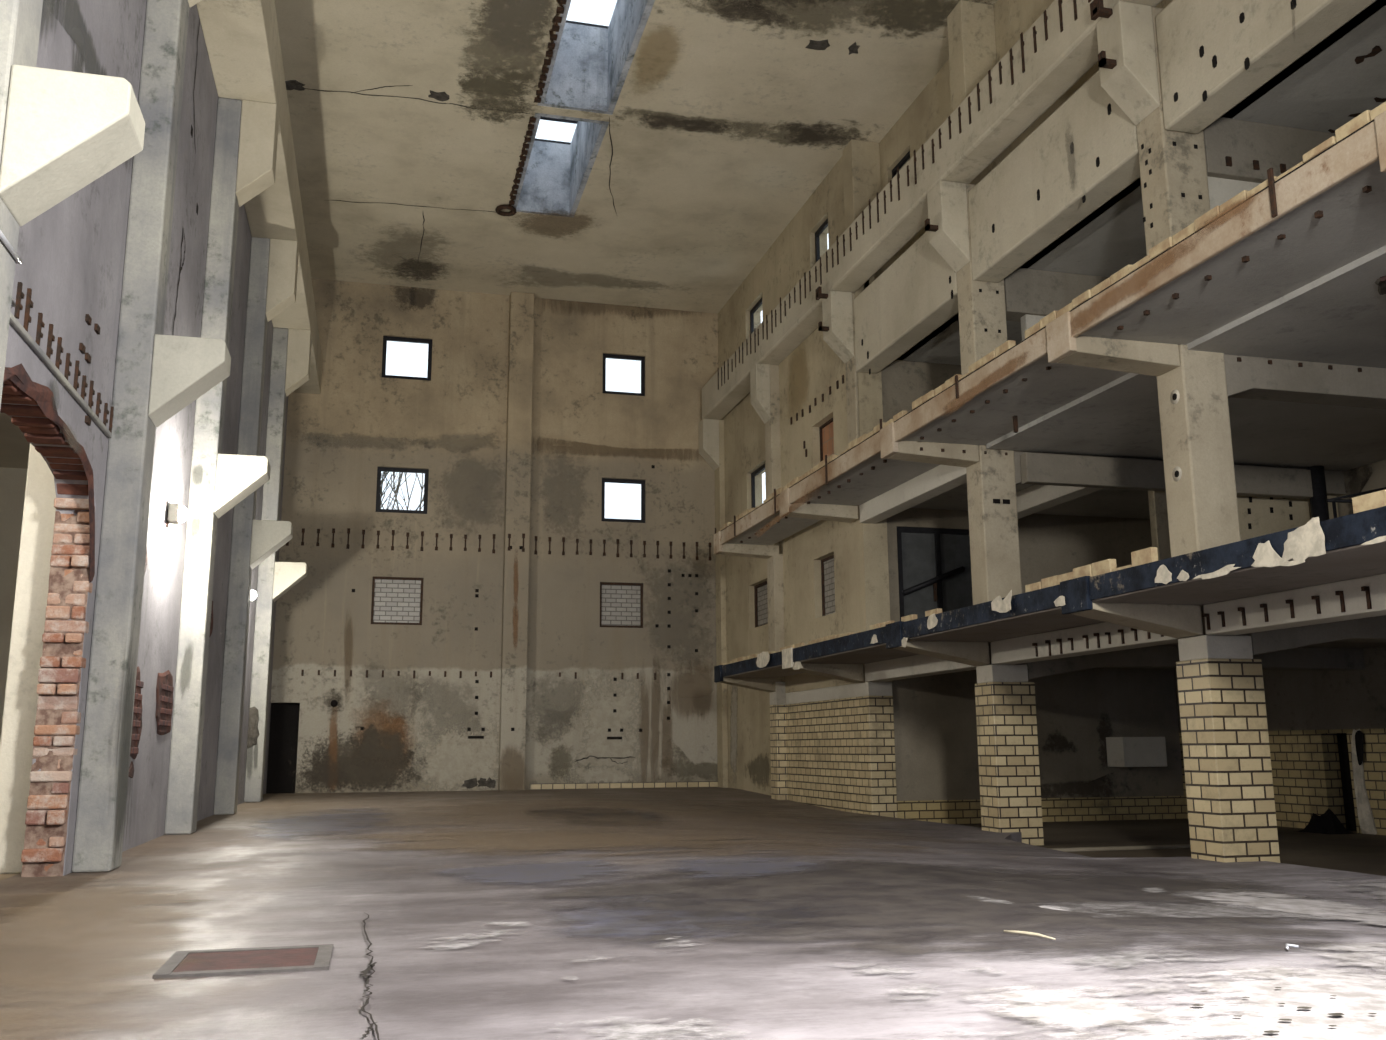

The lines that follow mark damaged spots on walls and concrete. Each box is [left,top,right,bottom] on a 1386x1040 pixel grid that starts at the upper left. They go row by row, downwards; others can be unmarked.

leakage [40,0,106,76]
leakage [462,0,552,121]
leakage [689,0,979,36]
leakage [625,110,858,148]
peeling [1155,517,1326,584]
peeling [1361,536,1386,545]
peeling [927,613,938,629]
peeling [991,590,1012,613]
corrosion [325,689,341,788]
crack [360,913,380,1040]